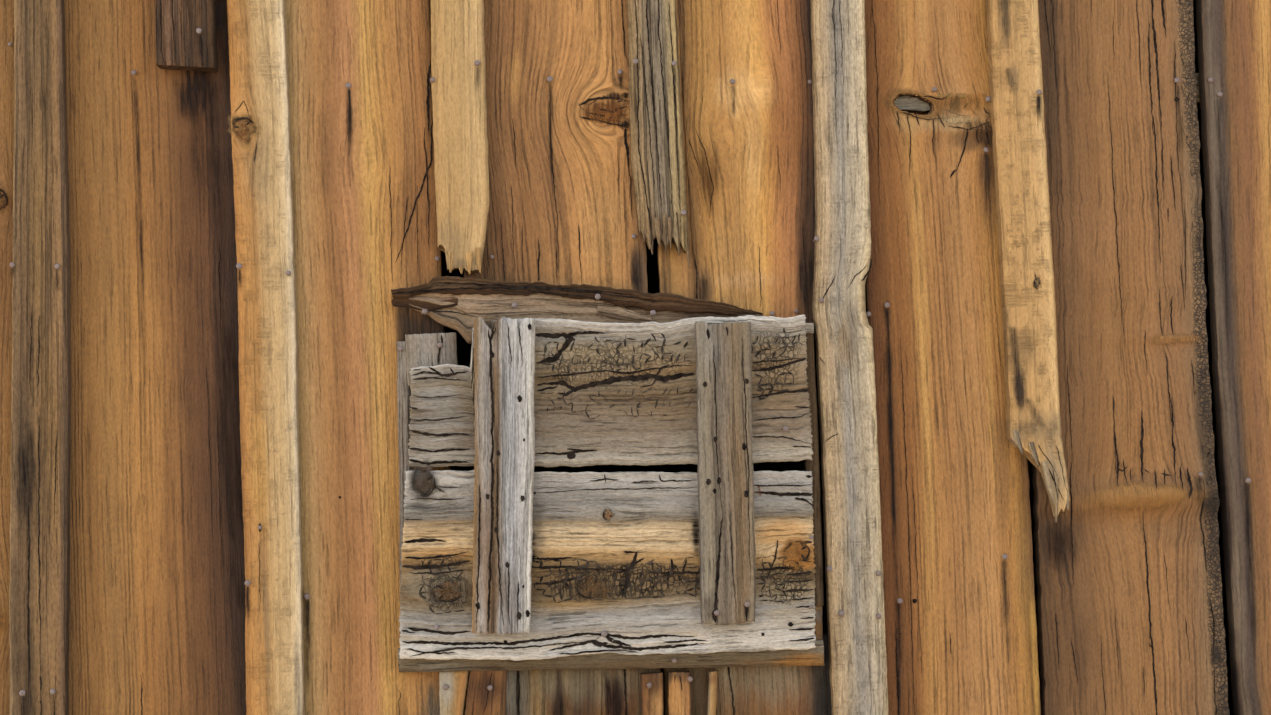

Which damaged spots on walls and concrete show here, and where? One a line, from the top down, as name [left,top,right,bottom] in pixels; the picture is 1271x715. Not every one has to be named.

crack [389,60,837,715]
crack [1110,394,1118,474]